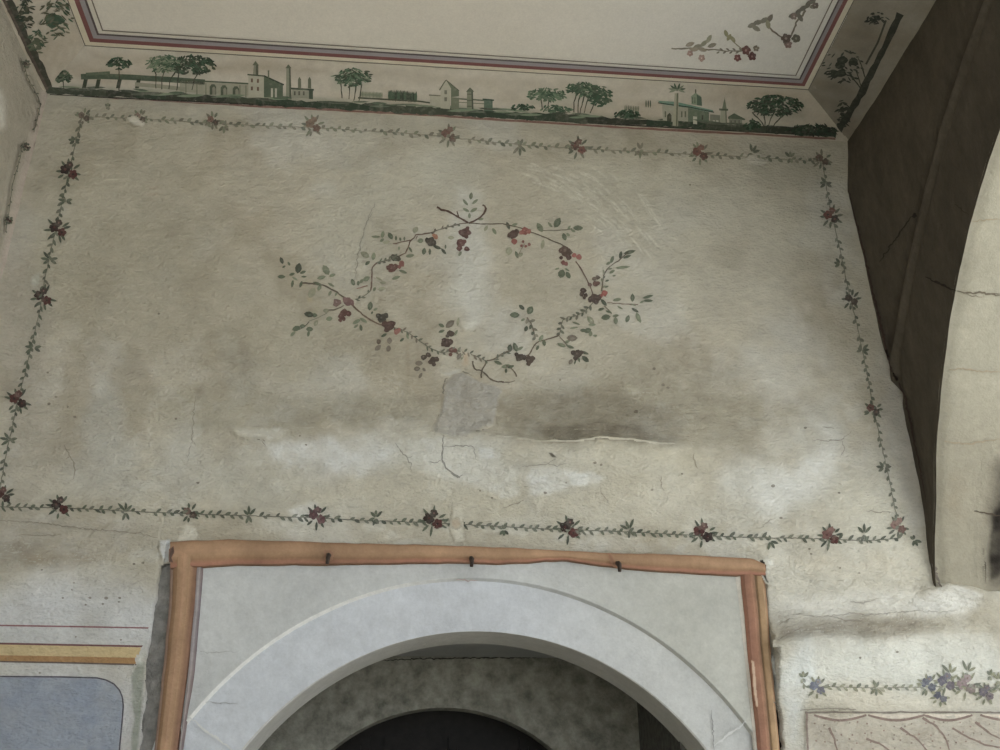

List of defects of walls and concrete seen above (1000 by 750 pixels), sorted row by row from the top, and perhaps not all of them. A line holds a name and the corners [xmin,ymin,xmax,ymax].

crack [926,277,1000,297]
leakage [175,249,454,440]
crack [395,371,484,478]
leakage [487,313,812,479]
crack [771,600,952,675]
crack [774,702,782,749]